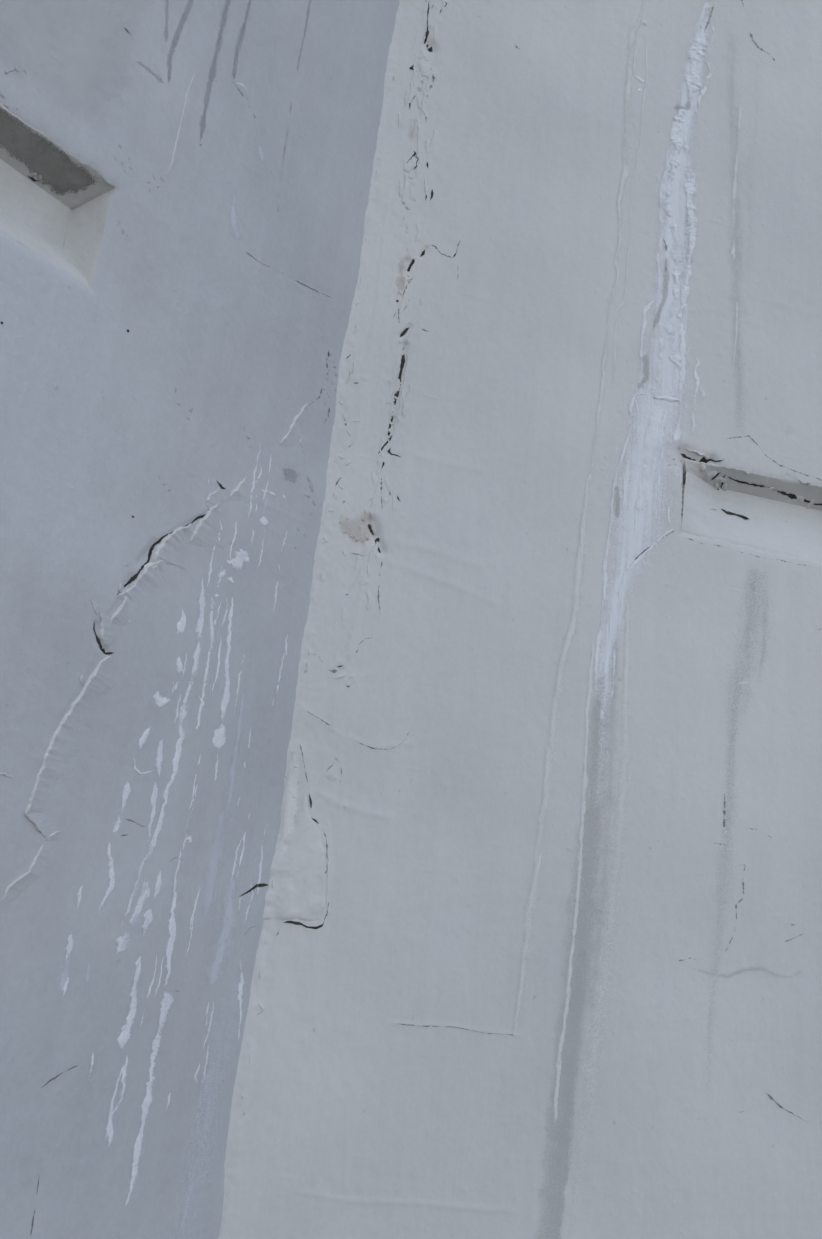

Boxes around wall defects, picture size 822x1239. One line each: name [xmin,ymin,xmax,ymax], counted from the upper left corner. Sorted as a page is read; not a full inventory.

spalling [281,349,382,566]
crack [635,435,822,565]